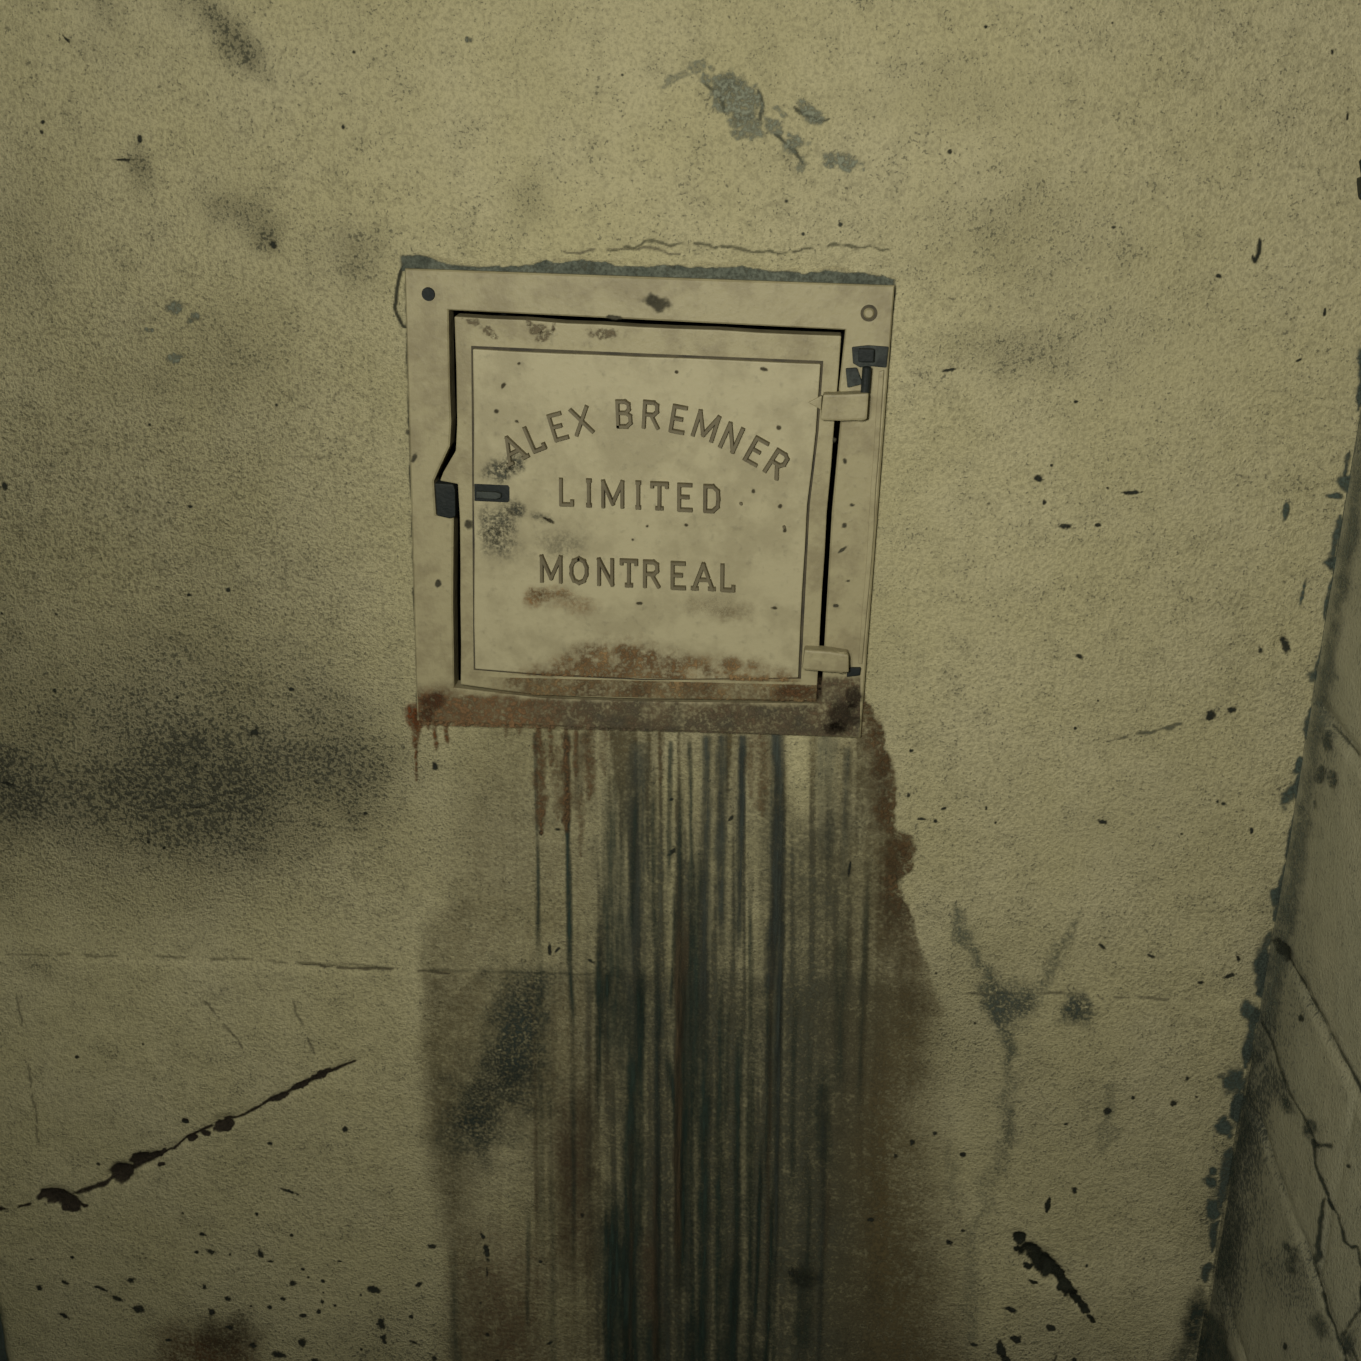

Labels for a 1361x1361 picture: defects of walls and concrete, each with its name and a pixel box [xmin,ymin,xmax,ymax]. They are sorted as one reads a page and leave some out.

corrosion [406,644,916,943]
crack [0,1015,356,1212]
damp [429,730,956,1361]
damp [1179,1299,1232,1361]
crack [1261,1021,1361,1361]
crack [1273,939,1361,1092]